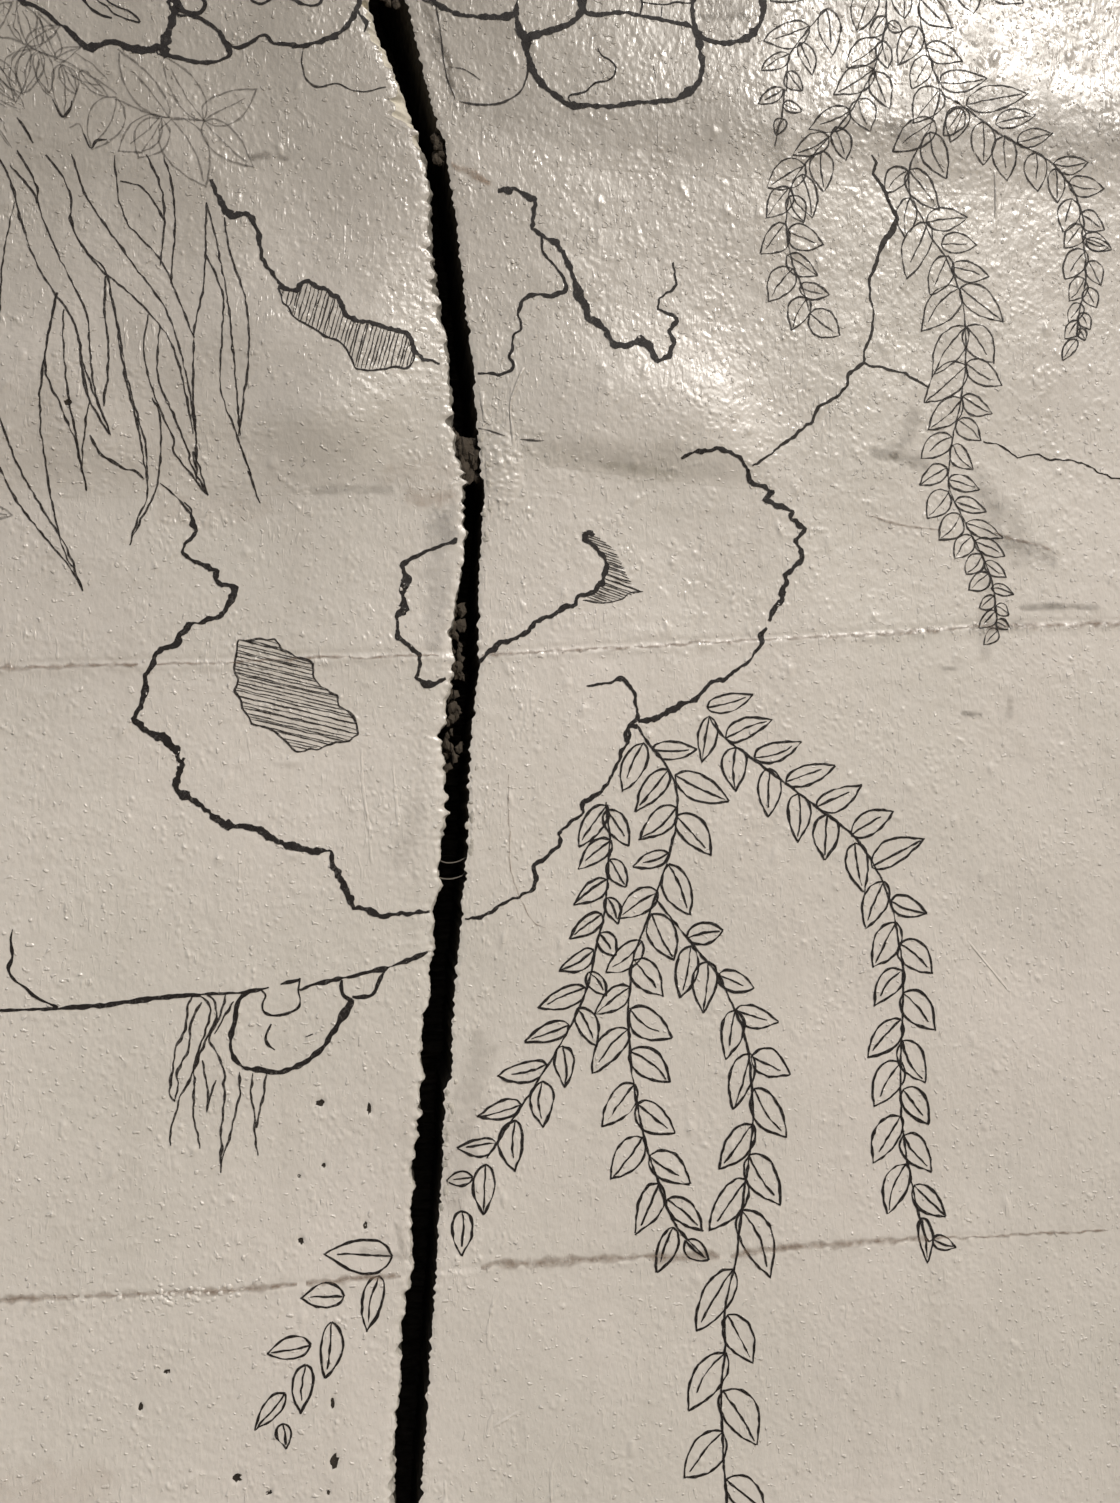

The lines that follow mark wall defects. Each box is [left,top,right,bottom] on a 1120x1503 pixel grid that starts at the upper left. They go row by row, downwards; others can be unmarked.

crack [983,441,1120,479]
crack [818,622,1119,642]
crack [34,0,929,1503]